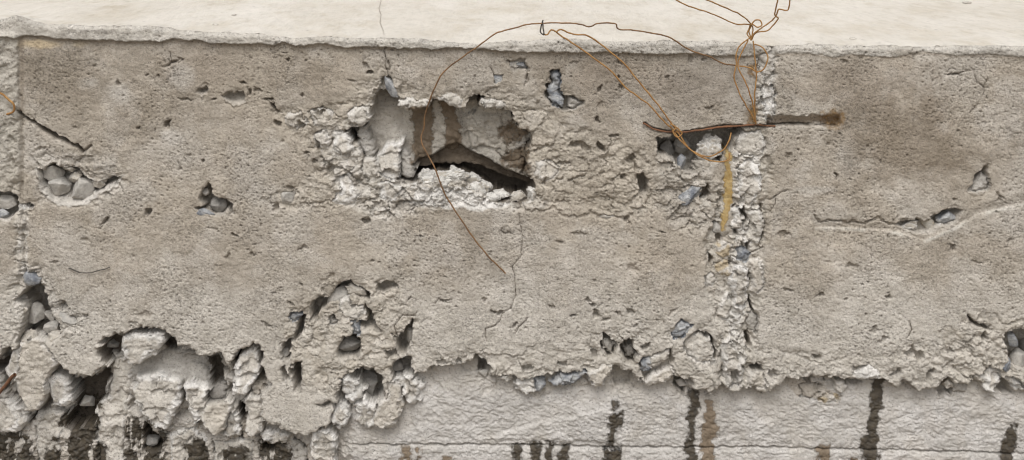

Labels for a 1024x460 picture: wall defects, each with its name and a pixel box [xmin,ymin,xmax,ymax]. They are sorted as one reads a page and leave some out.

crack [14,106,87,157]
spalling [285,55,560,219]
rust [720,144,733,231]
spalling [652,51,844,336]
crack [485,218,527,337]
spalling [0,230,427,460]
spalling [471,314,769,402]
spalling [930,310,1024,403]
water stain [602,400,624,460]
water stain [683,388,720,460]
water stain [851,379,885,460]
water stain [1000,423,1018,460]